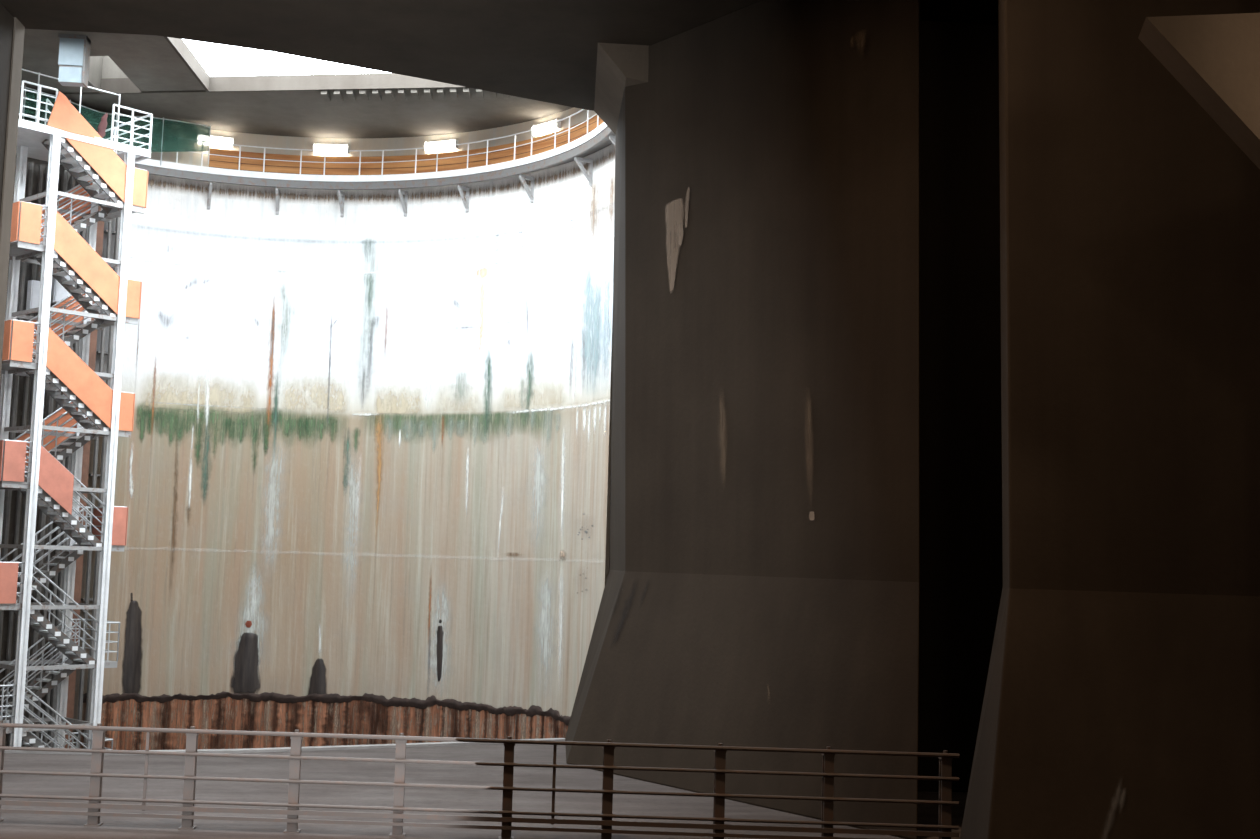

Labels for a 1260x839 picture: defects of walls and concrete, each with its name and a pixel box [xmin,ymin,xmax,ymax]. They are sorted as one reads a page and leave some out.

damp [146,381,252,422]
rust [267,308,275,438]
damp [571,273,610,388]
damp [266,385,419,547]
damp [516,400,610,527]
damp [122,593,142,694]
damp [231,577,264,694]
damp [308,629,326,699]
damp [430,594,448,685]